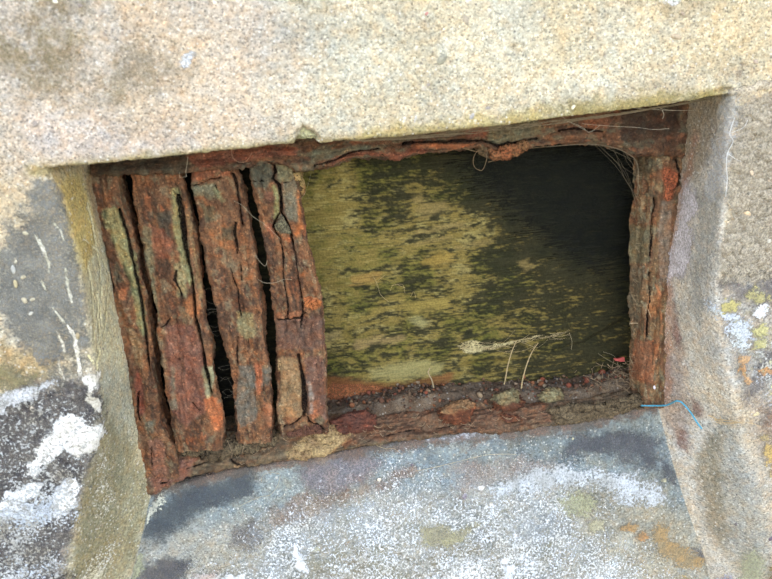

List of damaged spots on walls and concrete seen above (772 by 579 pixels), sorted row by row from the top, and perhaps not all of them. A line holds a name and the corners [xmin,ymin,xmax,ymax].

corrosion [488,139,529,161]
damp [0,179,110,387]
corrosion [303,295,319,310]
corrosion [326,381,390,400]
corrosion [286,423,352,461]
damp [143,470,254,543]
damp [140,559,191,579]